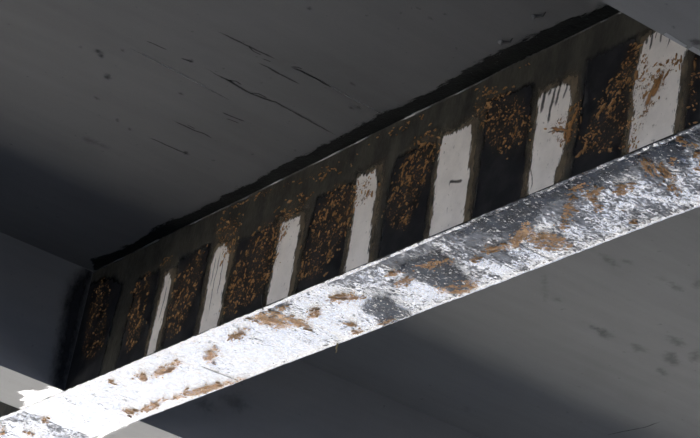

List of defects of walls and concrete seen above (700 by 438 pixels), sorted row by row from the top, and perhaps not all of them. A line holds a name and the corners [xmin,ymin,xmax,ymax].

rust [131,360,182,382]
rust [123,377,247,418]
leakage [195,239,238,335]
crack [220,76,327,131]
rust [227,306,320,342]
crack [224,34,328,86]
leakage [263,208,308,307]
leakage [341,160,385,274]
leakage [424,114,481,238]
leakage [522,73,580,197]
rust [470,182,637,263]
rust [544,40,682,196]